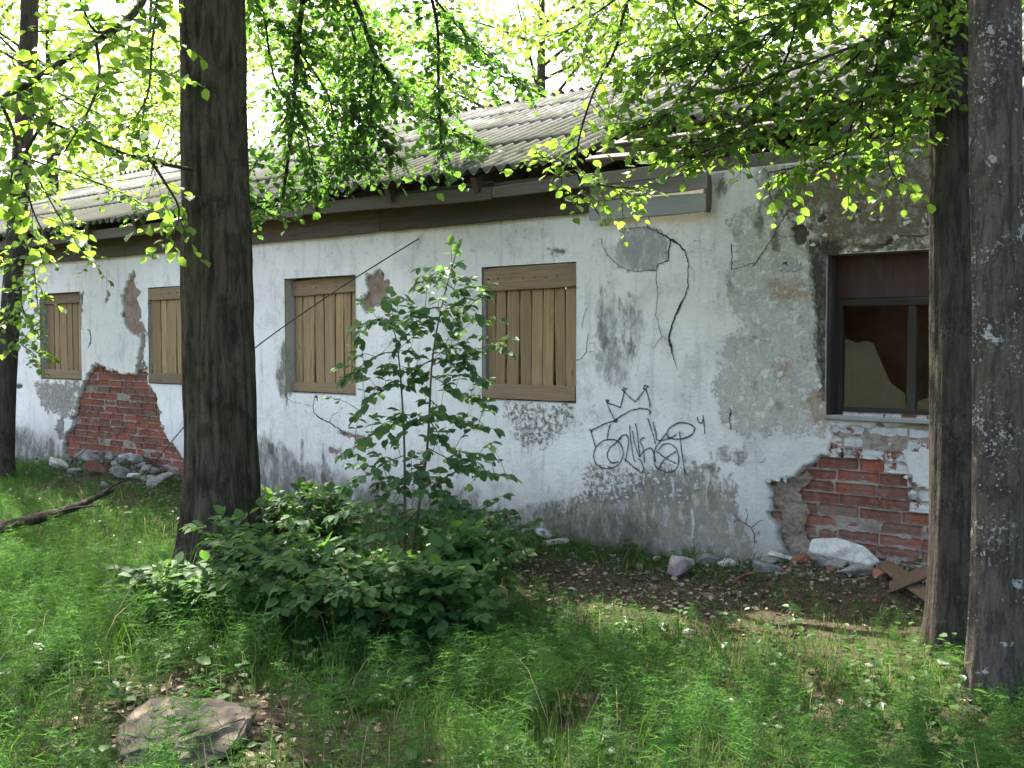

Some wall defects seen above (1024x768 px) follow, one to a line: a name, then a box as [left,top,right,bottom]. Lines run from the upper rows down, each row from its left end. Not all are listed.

spalling [17,273,184,476]
spalling [360,270,390,313]
leakage [597,310,634,379]
crack [601,217,695,370]
peeling [711,181,929,579]
leakage [509,452,760,562]